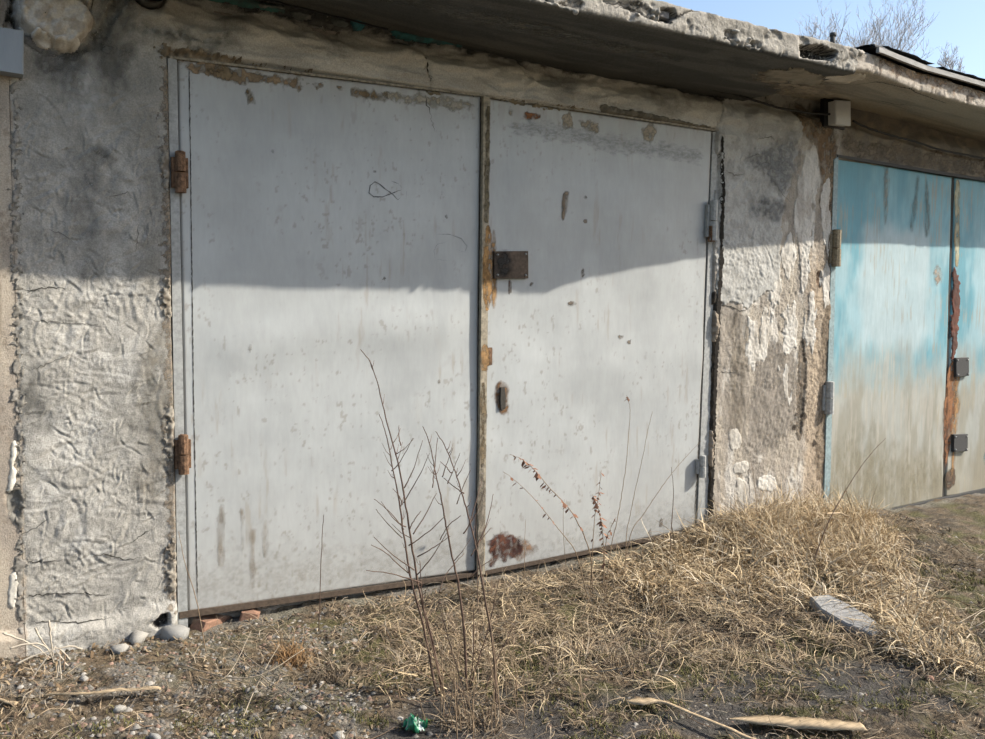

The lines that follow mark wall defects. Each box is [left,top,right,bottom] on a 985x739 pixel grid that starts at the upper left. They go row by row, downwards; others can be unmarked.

corrosion [483,106,497,311]
spalling [499,98,599,133]
peeling [758,44,867,85]
damp [24,381,43,417]
crack [28,592,136,624]
crack [93,529,153,560]
spalling [153,42,313,614]
corrosion [481,344,490,371]
corrosion [477,382,533,572]
crack [707,136,790,520]
peeling [744,142,834,480]
corrosion [935,267,961,489]